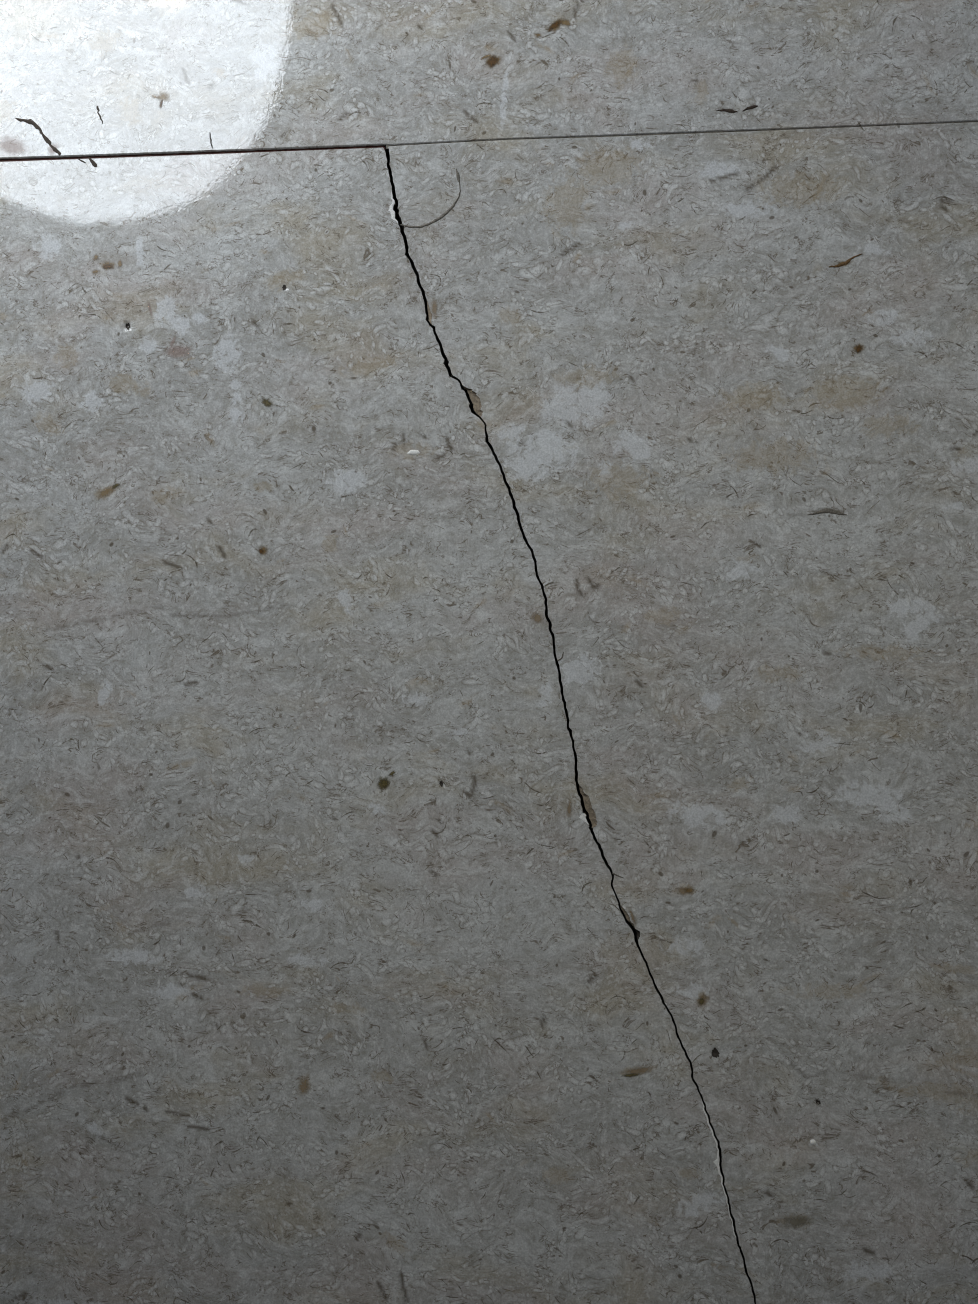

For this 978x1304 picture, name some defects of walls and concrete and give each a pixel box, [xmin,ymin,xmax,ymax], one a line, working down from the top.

crack [829,254,862,268]
crack [807,507,847,515]
crack [386,152,756,1304]